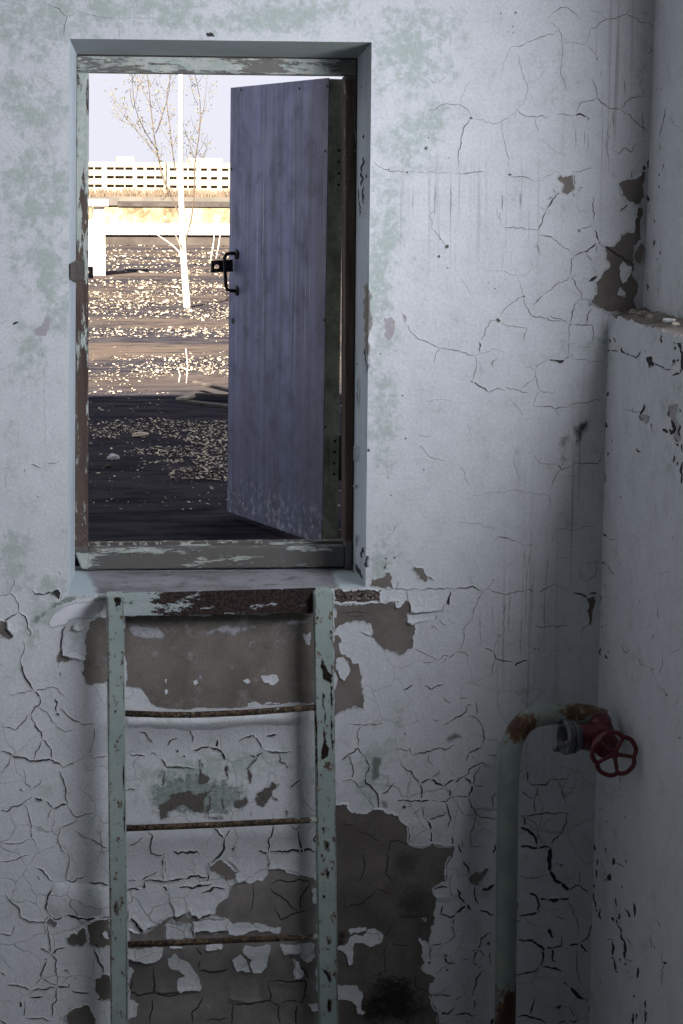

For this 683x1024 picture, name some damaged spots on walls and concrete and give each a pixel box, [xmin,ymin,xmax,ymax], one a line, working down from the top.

crack [373,5,679,548]
flaking render [588,170,663,315]
peeling [56,615,107,687]
peeling [124,613,314,711]
peeling [332,533,449,718]
crack [0,570,316,1024]
peeling [158,759,277,820]
crack [341,523,680,1024]
flaking render [45,917,110,949]
flaking render [64,972,110,1024]
flaking render [127,852,318,1024]
flaking render [336,802,457,1024]